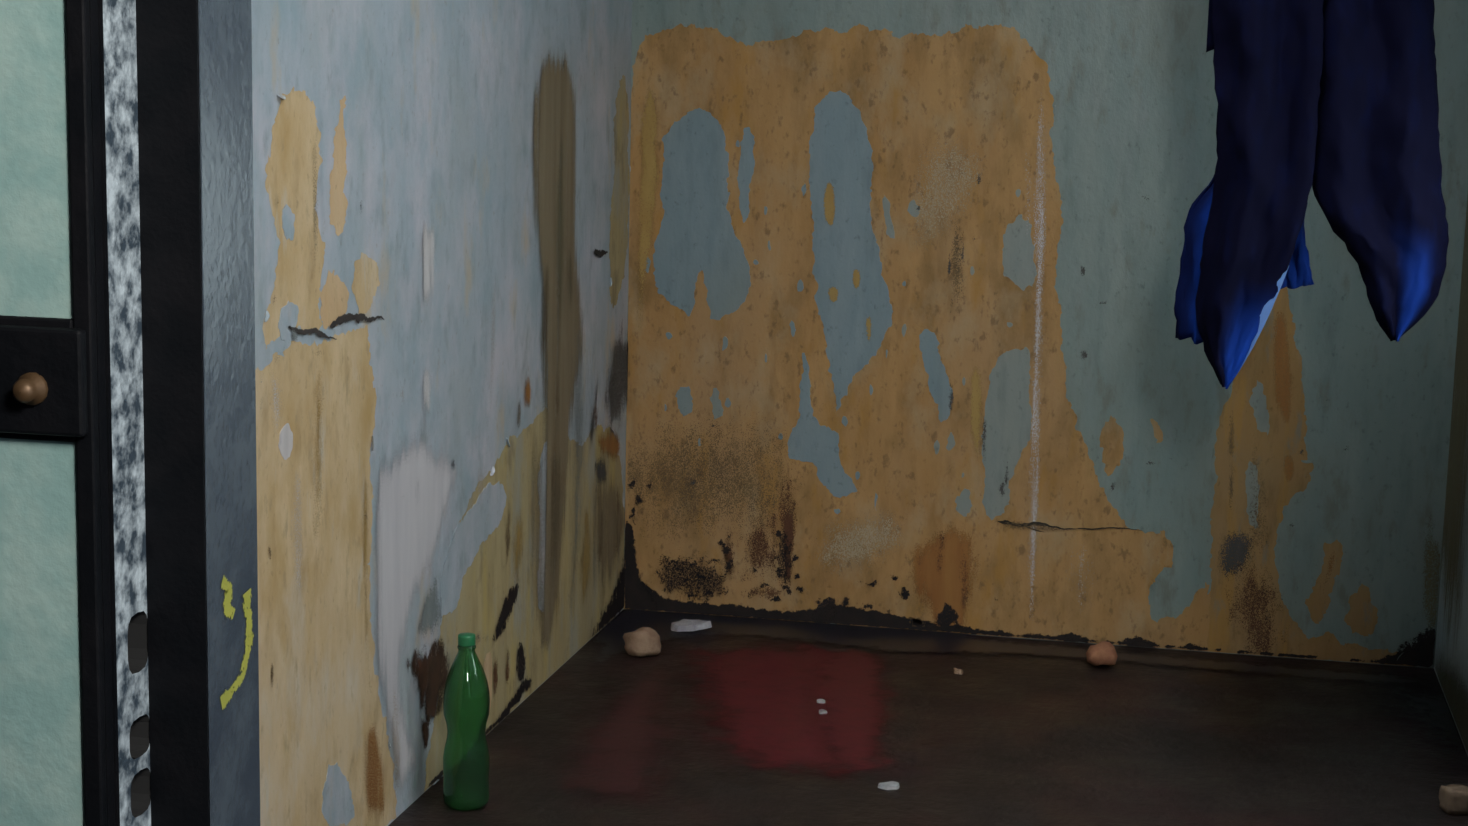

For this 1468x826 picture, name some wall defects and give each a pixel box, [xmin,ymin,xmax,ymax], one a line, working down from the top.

peeling [255,86,397,826]
peeling [424,23,1415,792]
water stain [476,50,1468,808]